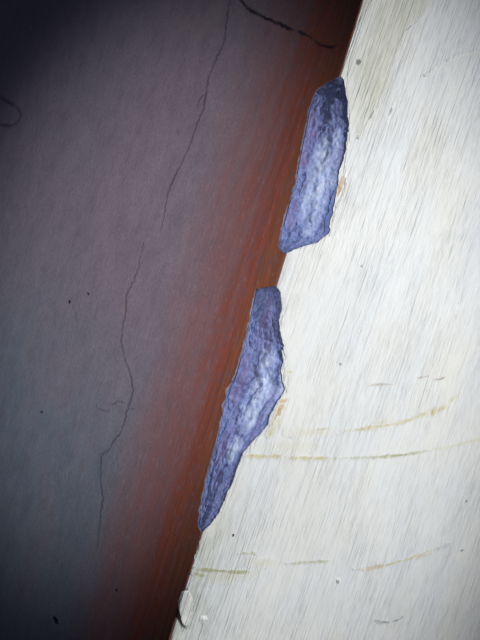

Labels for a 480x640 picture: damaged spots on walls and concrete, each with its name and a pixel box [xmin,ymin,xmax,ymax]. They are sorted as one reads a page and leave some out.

crack [159,0,338,232]
spalling [277,0,433,254]
crack [94,242,143,548]
spalling [197,286,288,532]
rust [265,397,289,440]